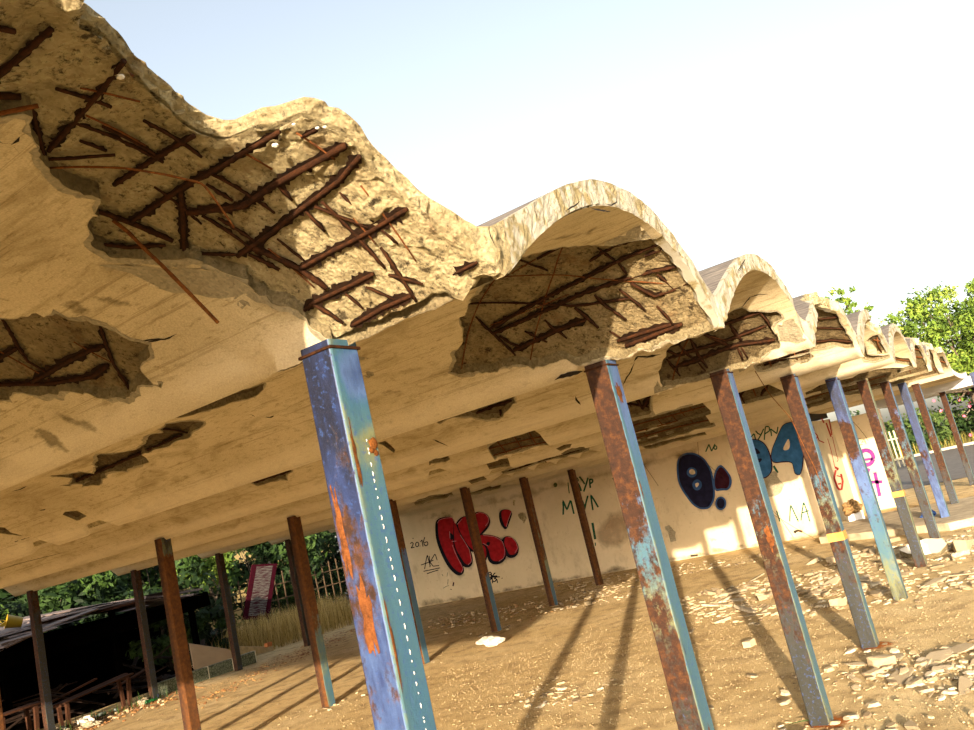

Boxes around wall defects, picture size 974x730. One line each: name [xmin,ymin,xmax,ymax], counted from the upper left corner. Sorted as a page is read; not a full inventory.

spalling [0,0,948,449]
spalling [56,383,267,488]
corrosion [348,417,363,486]
corrosion [368,437,379,456]
spalling [470,430,590,495]
corrosion [330,485,380,656]
corrosion [764,524,774,552]
corrosion [384,601,403,692]